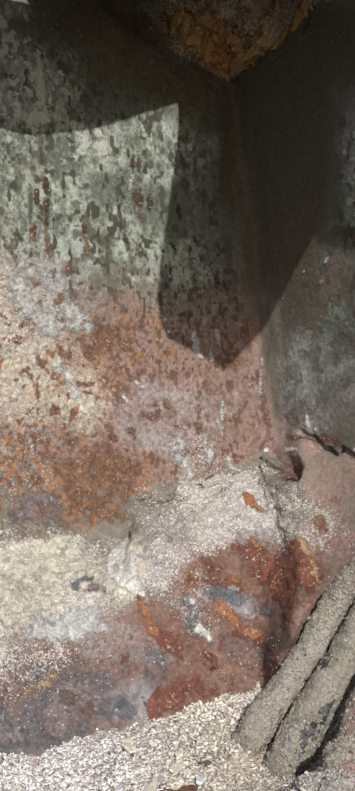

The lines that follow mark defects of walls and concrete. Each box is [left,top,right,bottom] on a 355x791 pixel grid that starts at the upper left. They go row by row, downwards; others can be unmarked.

rust [161,0,313,81]
rust [30,177,52,253]
rust [132,192,154,222]
rust [145,400,172,421]
leakage [284,410,355,452]
rust [9,440,138,526]
rust [242,492,268,512]
rust [187,556,244,595]
rust [231,537,324,624]
rust [137,594,184,658]
rust [212,599,264,650]
rust [142,677,217,721]